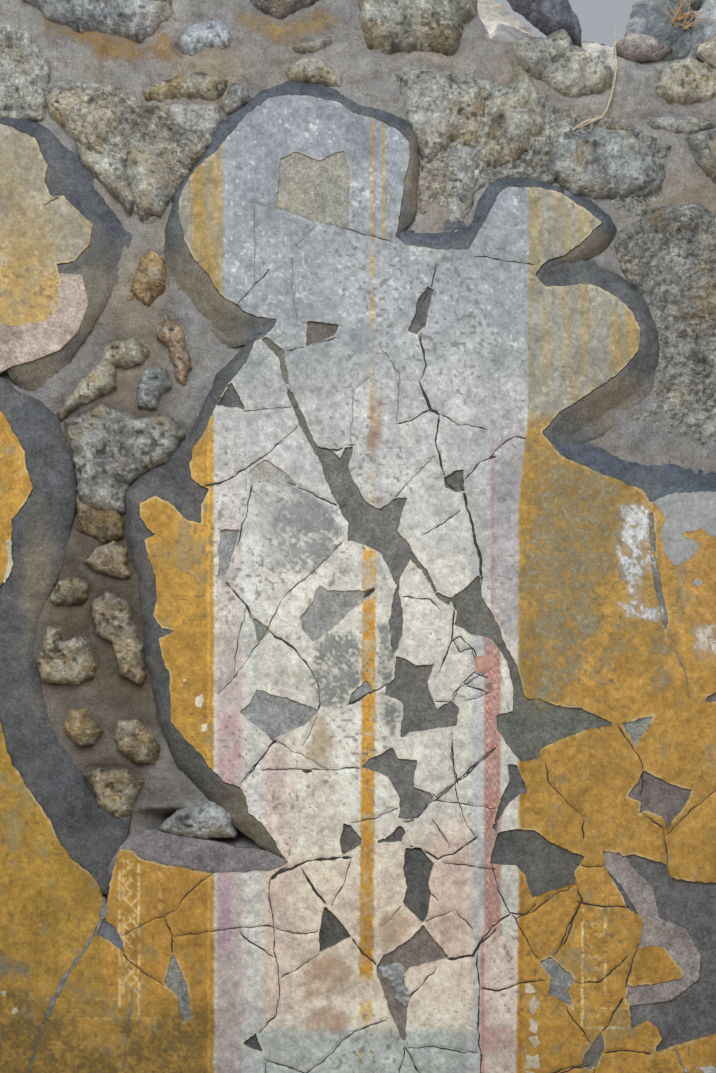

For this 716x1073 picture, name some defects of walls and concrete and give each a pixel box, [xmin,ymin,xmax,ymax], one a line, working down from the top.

spalling [0,254,89,373]
spalling [418,68,716,465]
crack [204,407,298,547]
crack [319,336,526,584]
crack [218,542,392,783]
crack [403,596,490,702]
spalling [257,335,652,897]
crack [27,856,352,1072]
spalling [319,907,350,951]
spalling [362,747,448,1040]
crack [352,741,629,1073]
spalling [602,851,716,1051]